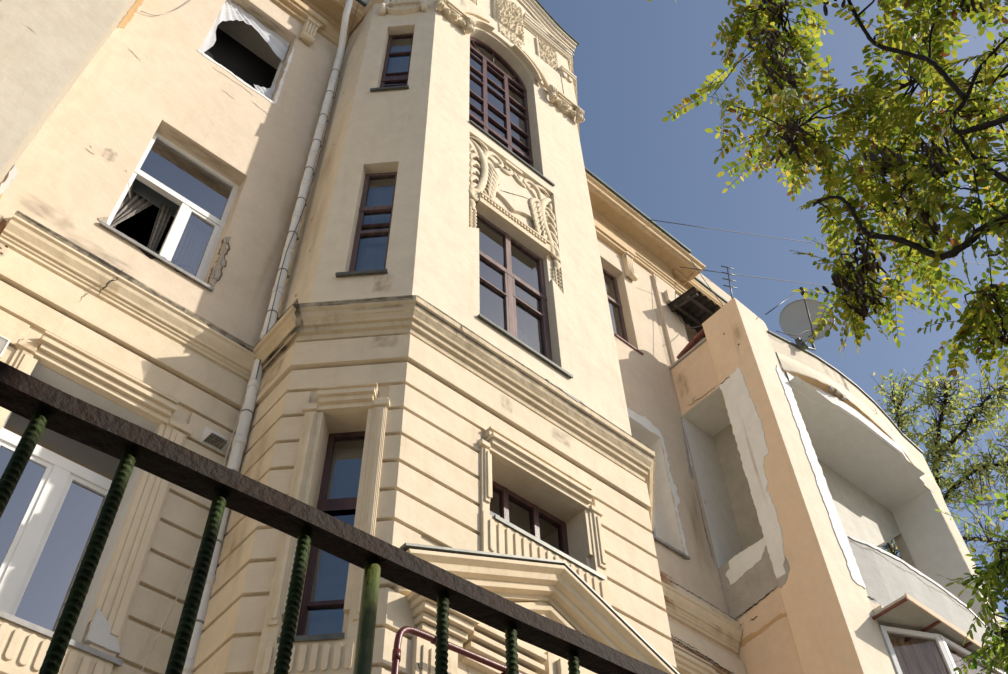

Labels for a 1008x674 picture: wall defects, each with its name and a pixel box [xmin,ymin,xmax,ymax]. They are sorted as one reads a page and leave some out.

crack [96,256,122,295]
flaking render [207,236,231,287]
spalling [718,546,790,621]